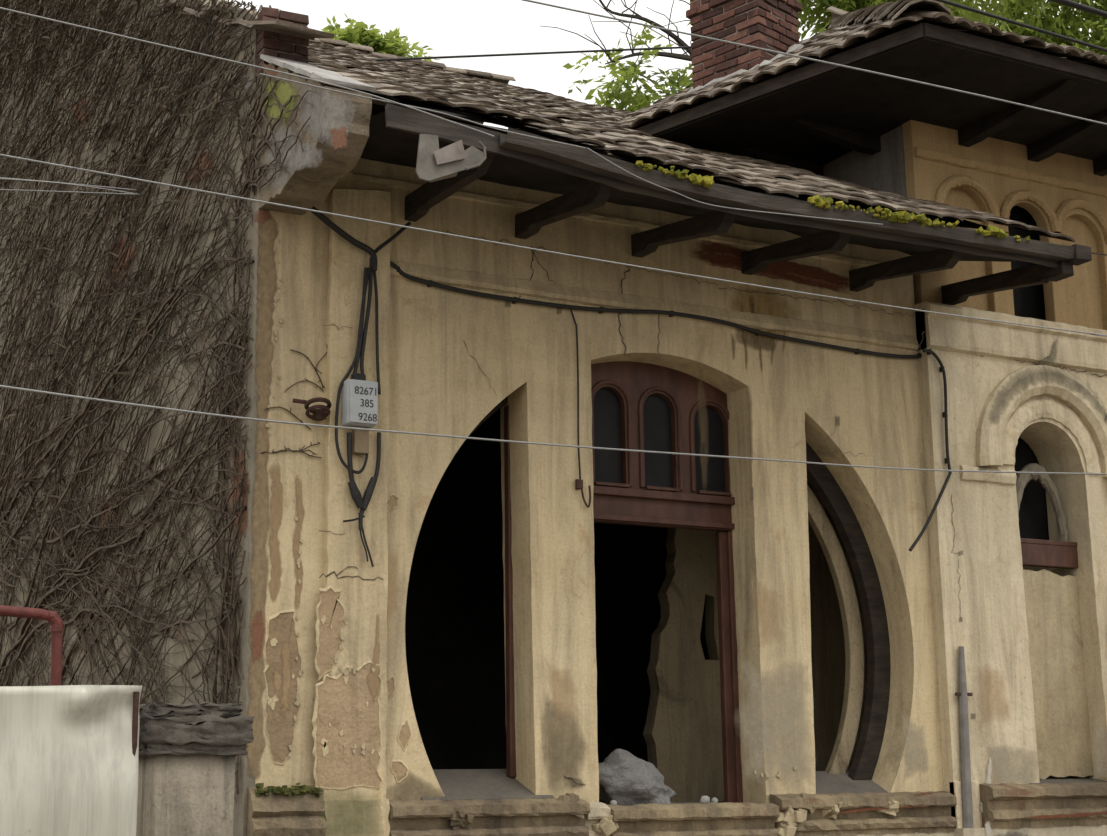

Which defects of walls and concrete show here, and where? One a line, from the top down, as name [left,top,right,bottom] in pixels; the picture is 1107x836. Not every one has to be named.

crack [445,231,926,357]
peeling [231,210,413,791]
crack [319,566,383,580]